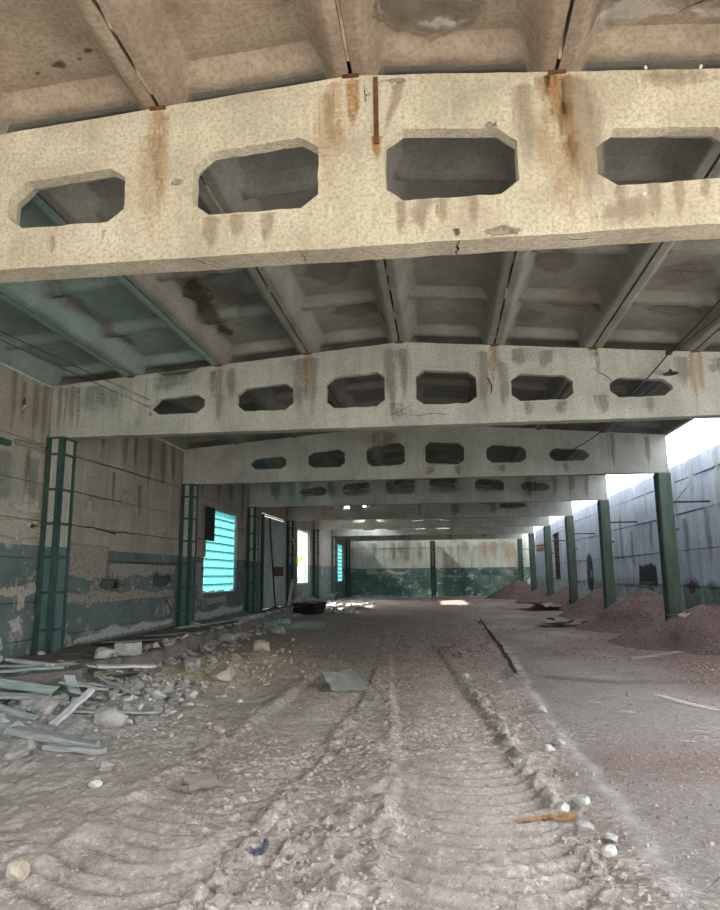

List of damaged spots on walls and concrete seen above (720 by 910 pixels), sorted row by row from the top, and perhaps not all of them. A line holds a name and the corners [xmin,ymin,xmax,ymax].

rust [321,79,358,152]
rust [542,74,579,169]
damp [177,270,248,335]
crack [73,524,140,535]
peeling [67,543,177,605]
peeling [0,578,37,653]